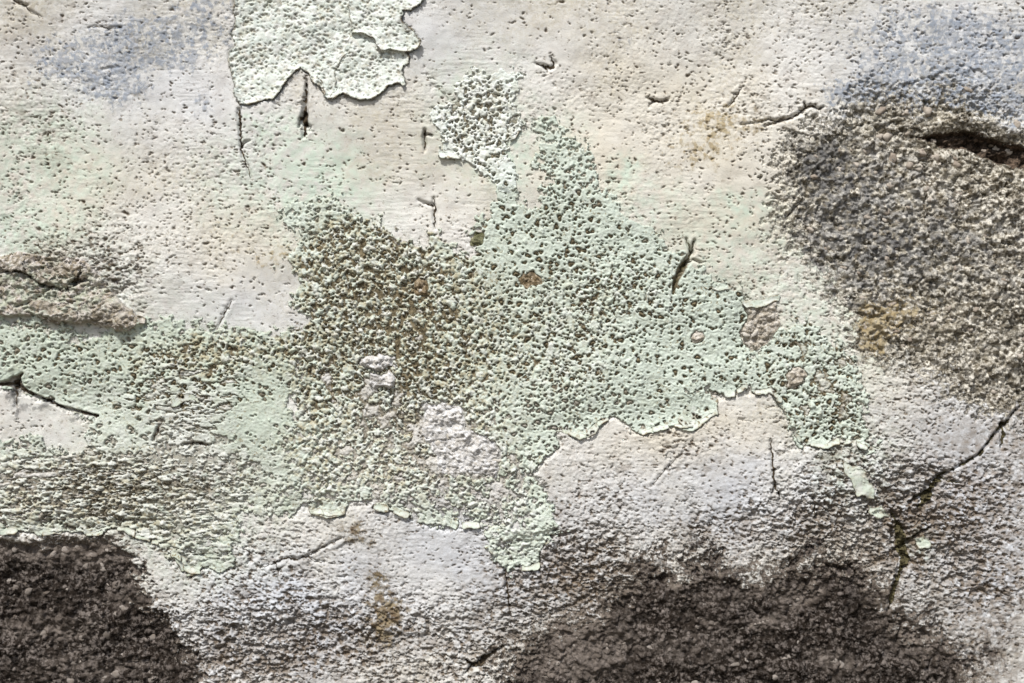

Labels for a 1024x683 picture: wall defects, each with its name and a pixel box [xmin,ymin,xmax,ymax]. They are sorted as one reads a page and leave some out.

peeling [228,0,423,105]
crack [299,83,311,136]
crack [673,240,697,294]
spalling [767,75,1024,431]
crack [0,374,99,417]
peeling [0,66,882,683]
damp [640,534,767,580]
damp [792,536,824,558]
peeling [843,461,890,528]
crack [888,409,1017,609]
spalling [468,520,1003,683]
damp [912,586,1022,674]